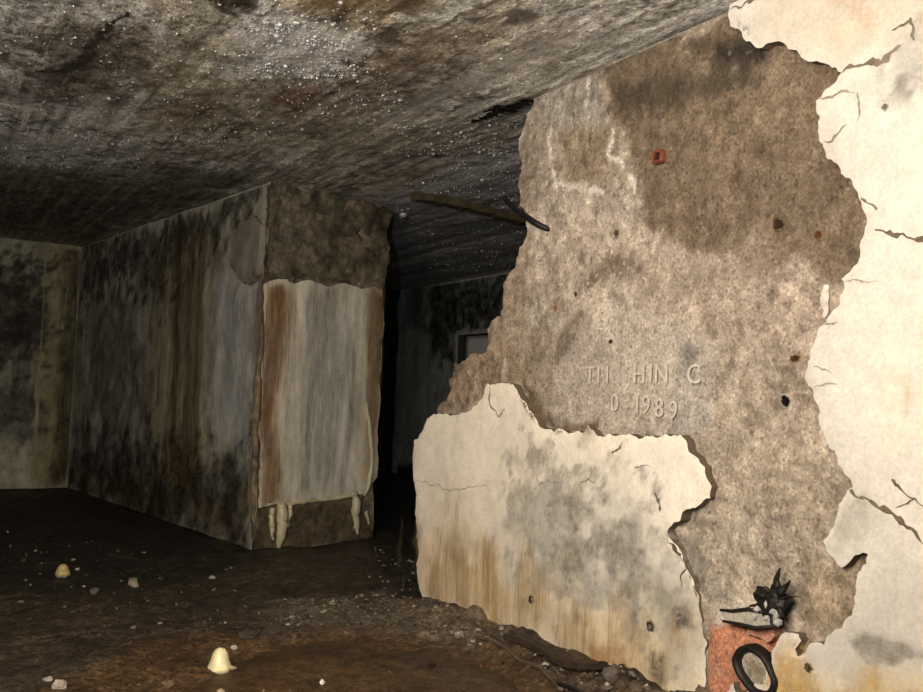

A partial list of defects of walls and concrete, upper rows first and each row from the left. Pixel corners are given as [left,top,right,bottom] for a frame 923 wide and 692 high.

water stain [717,41,763,81]
crack [860,195,923,242]
water stain [0,182,276,547]
corrosion [253,272,286,504]
spalling [437,10,868,692]
spalling [258,495,374,546]
water stain [430,465,598,624]
crack [849,479,923,544]